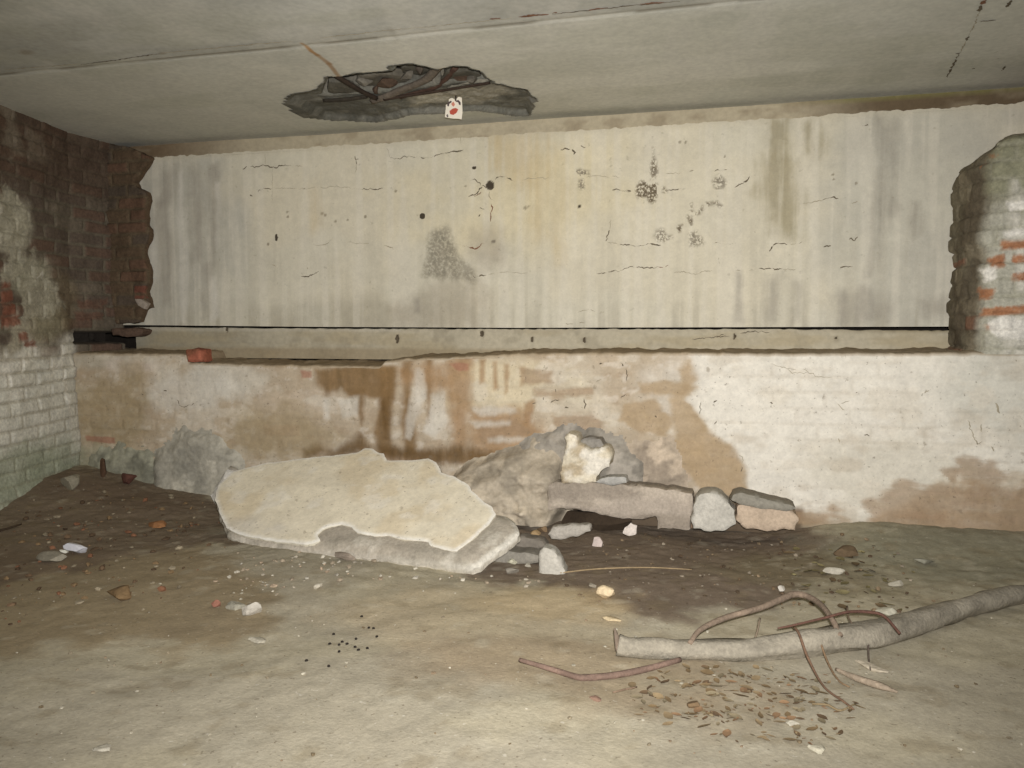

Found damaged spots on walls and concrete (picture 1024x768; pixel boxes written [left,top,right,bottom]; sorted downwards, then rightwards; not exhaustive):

corrosion [295,41,345,77]
spalling [281,64,539,123]
crack [946,0,1012,77]
peeling [0,174,72,353]
crack [244,158,381,200]
damp [374,131,594,328]
crack [469,146,631,250]
damp [629,142,672,209]
crack [598,221,858,275]
damp [649,110,952,327]
peeling [974,194,1024,345]
damp [399,362,532,449]